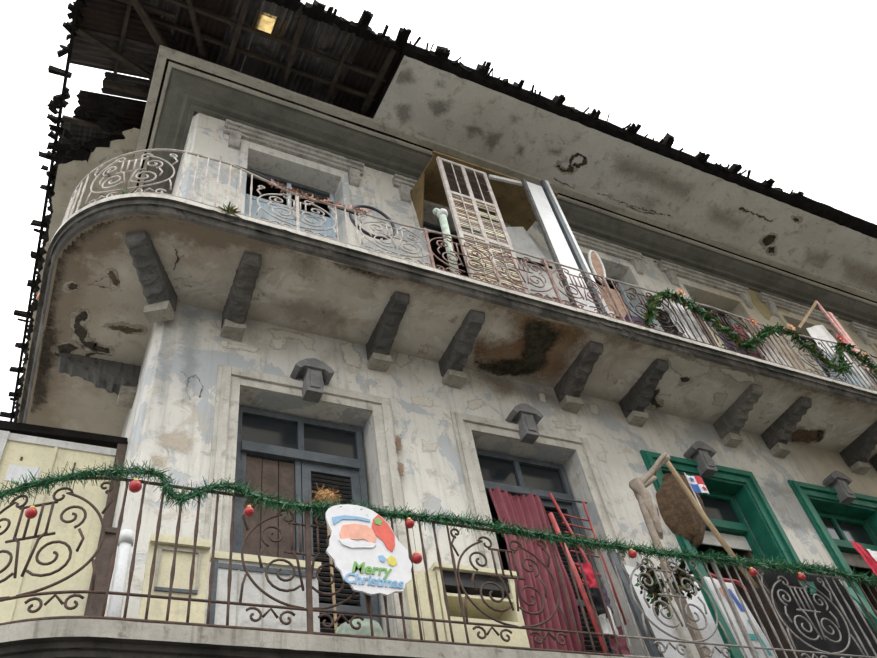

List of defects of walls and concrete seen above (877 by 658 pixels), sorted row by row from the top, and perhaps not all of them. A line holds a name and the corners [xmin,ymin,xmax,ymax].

spalling [759,232,778,256]
spalling [62,268,121,293]
spalling [50,308,114,356]
spalling [103,321,147,335]
water stain [476,318,562,376]
spalling [791,426,826,446]